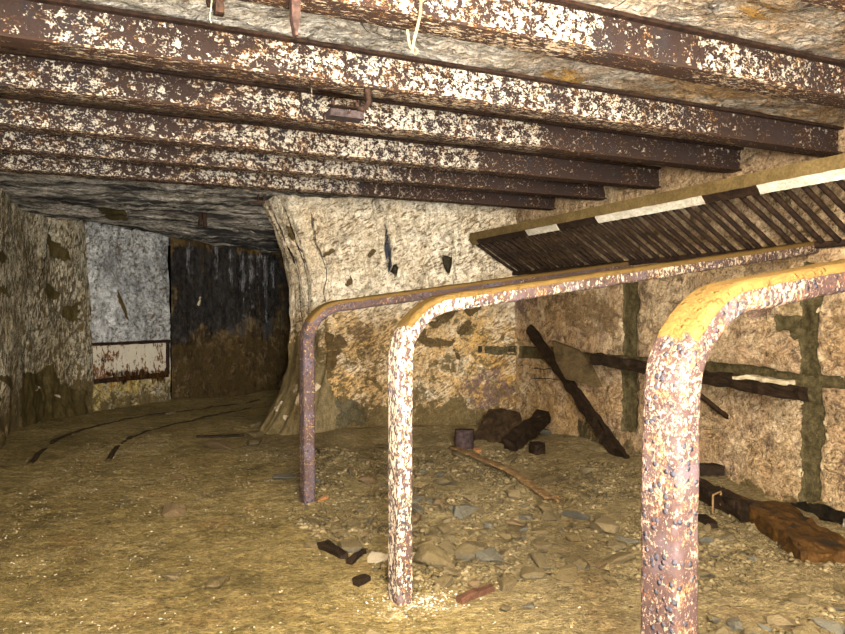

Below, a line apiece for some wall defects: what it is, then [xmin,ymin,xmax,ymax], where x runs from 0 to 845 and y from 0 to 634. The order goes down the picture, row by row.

leakage [228,250,274,323]
corrosion [93,368,167,387]